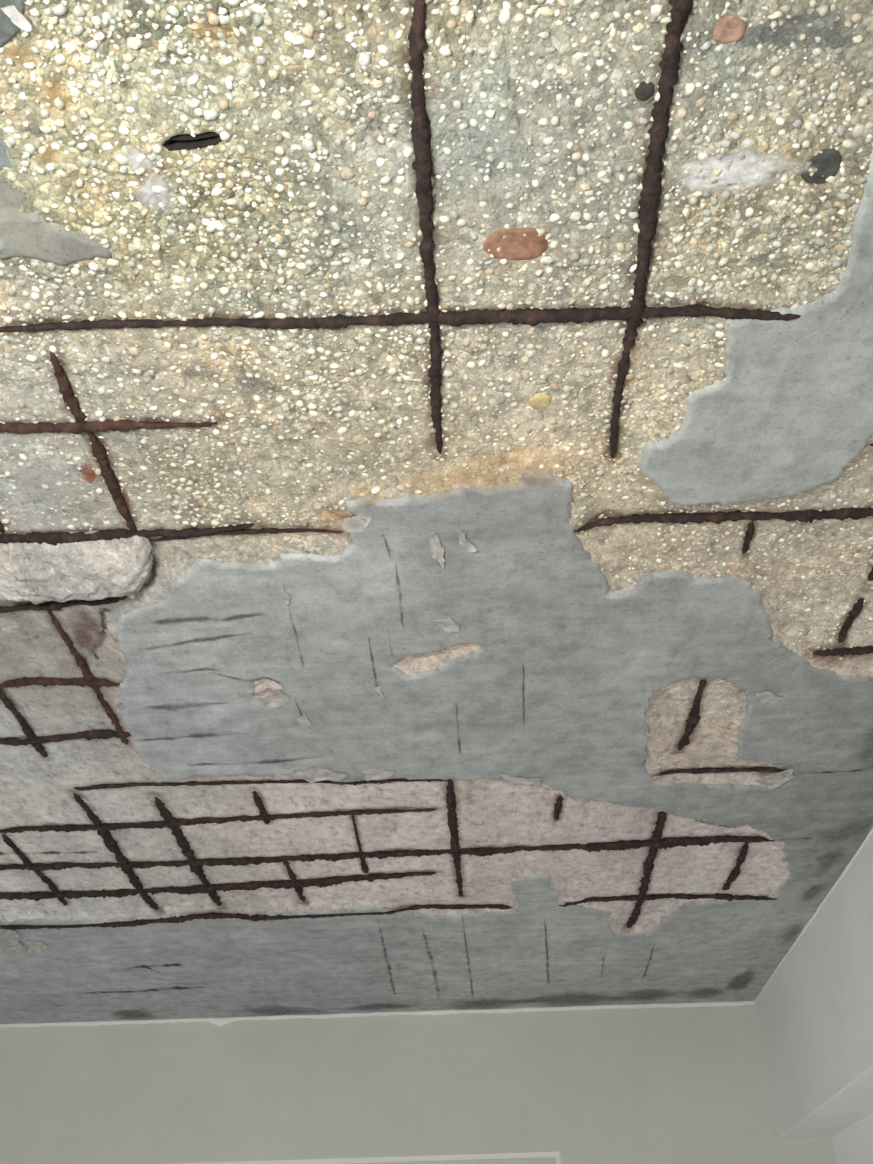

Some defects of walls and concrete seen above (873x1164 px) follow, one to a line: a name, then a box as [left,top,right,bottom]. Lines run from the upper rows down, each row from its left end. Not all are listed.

spalling [0,0,427,327]
rust [0,0,801,458]
spalling [422,0,673,312]
spalling [644,0,873,311]
flaking render [4,929,48,955]
rust [0,596,131,758]
rust [0,351,343,546]
rust [0,778,778,930]
spalling [0,316,873,934]
rust [656,767,785,776]
rust [574,508,873,554]
rust [812,598,873,657]